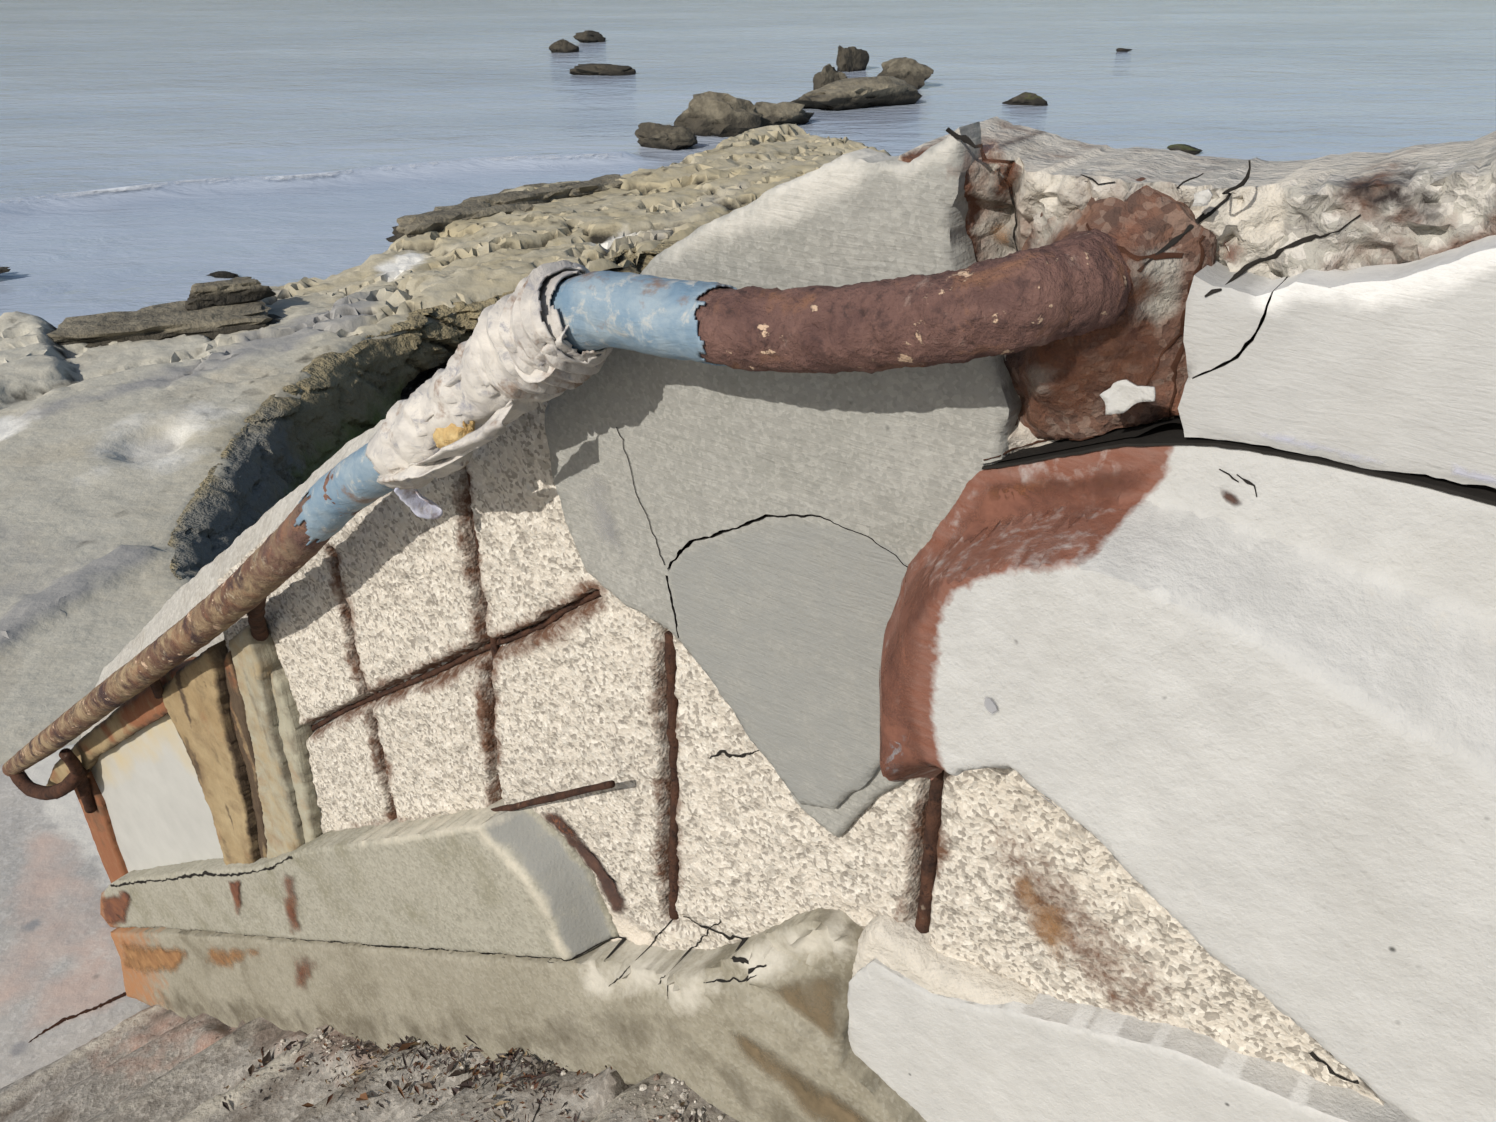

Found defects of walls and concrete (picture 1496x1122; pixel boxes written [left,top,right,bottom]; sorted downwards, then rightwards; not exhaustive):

spalling [898,134,950,163]
spalling [964,116,1496,280]
crack [982,160,1496,506]
peeling [1100,379,1156,429]
crack [616,427,908,638]
corrosion [879,569,941,782]
spalling [217,401,1385,1106]
corrosion [103,892,130,925]
corrosion [123,944,183,972]
corrosion [229,881,241,913]
crack [180,916,766,996]
corrosion [545,813,624,913]